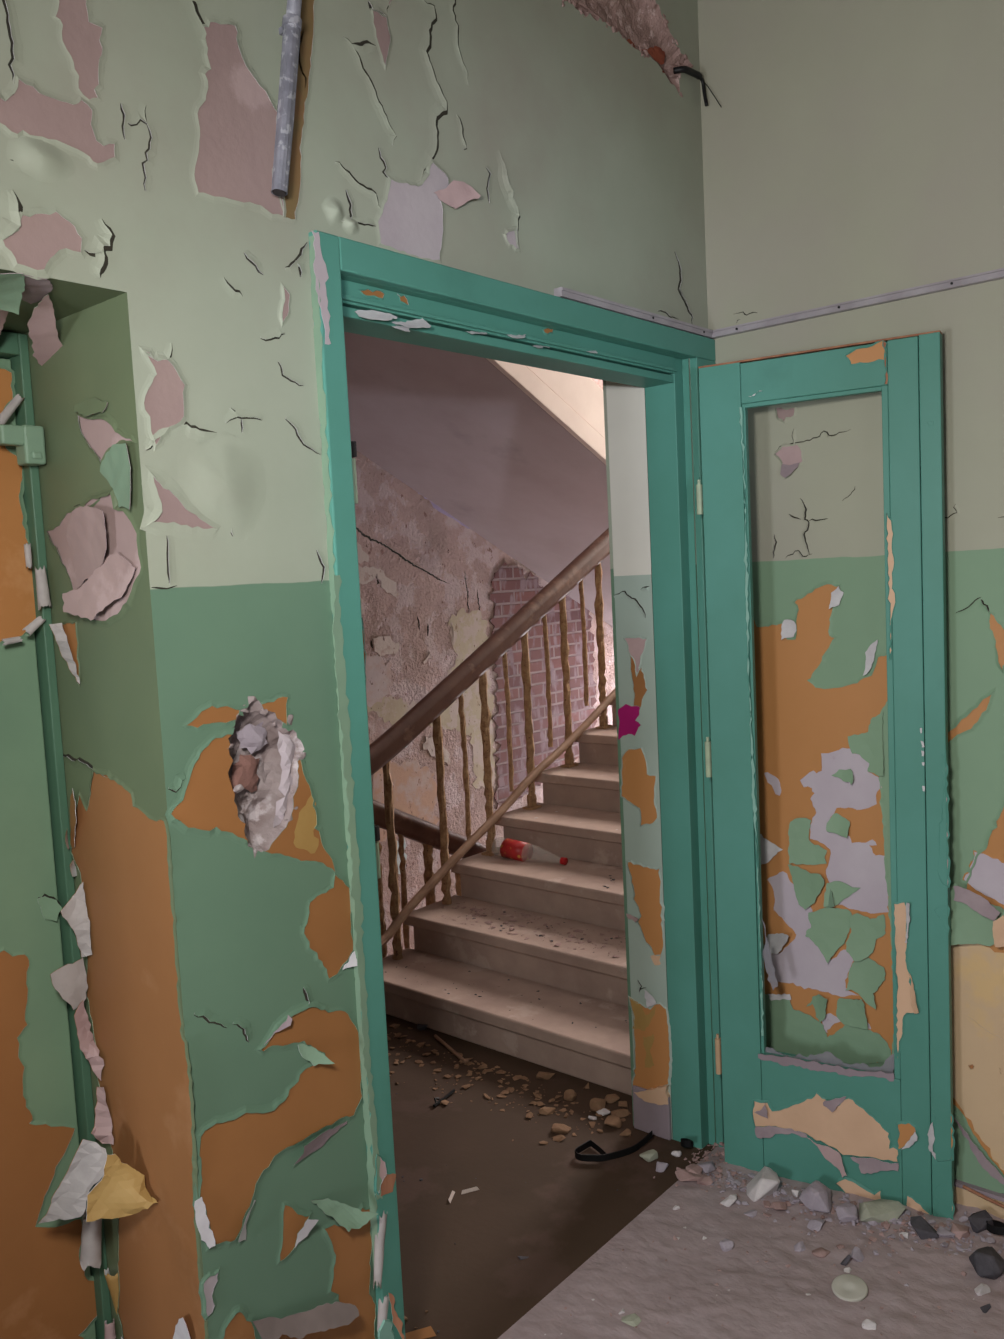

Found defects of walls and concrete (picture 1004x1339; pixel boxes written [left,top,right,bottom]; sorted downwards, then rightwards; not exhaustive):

crack [177,0,207,49]
peeling [189,0,317,224]
peeling [374,159,480,264]
crack [335,0,520,249]
crack [657,249,695,324]
crack [356,524,483,638]
crack [775,429,852,453]
crack [770,486,858,560]
peeling [0,206,407,1339]
peeling [372,595,597,825]
peeling [739,390,920,1066]
peeling [751,687,1004,1220]